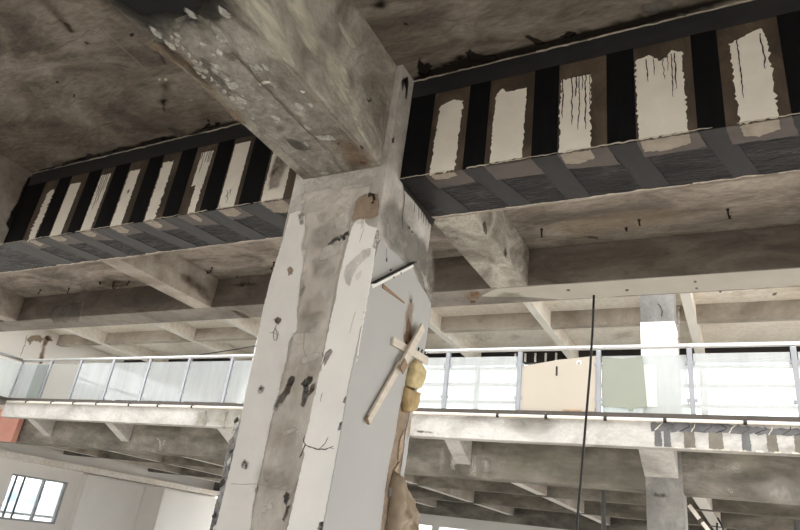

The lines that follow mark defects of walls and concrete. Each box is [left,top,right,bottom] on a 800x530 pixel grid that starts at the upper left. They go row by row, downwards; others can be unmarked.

peeling [147,17,342,177]
damp [402,0,729,99]
damp [561,72,591,129]
peeling [250,185,379,530]
crack [299,436,334,458]